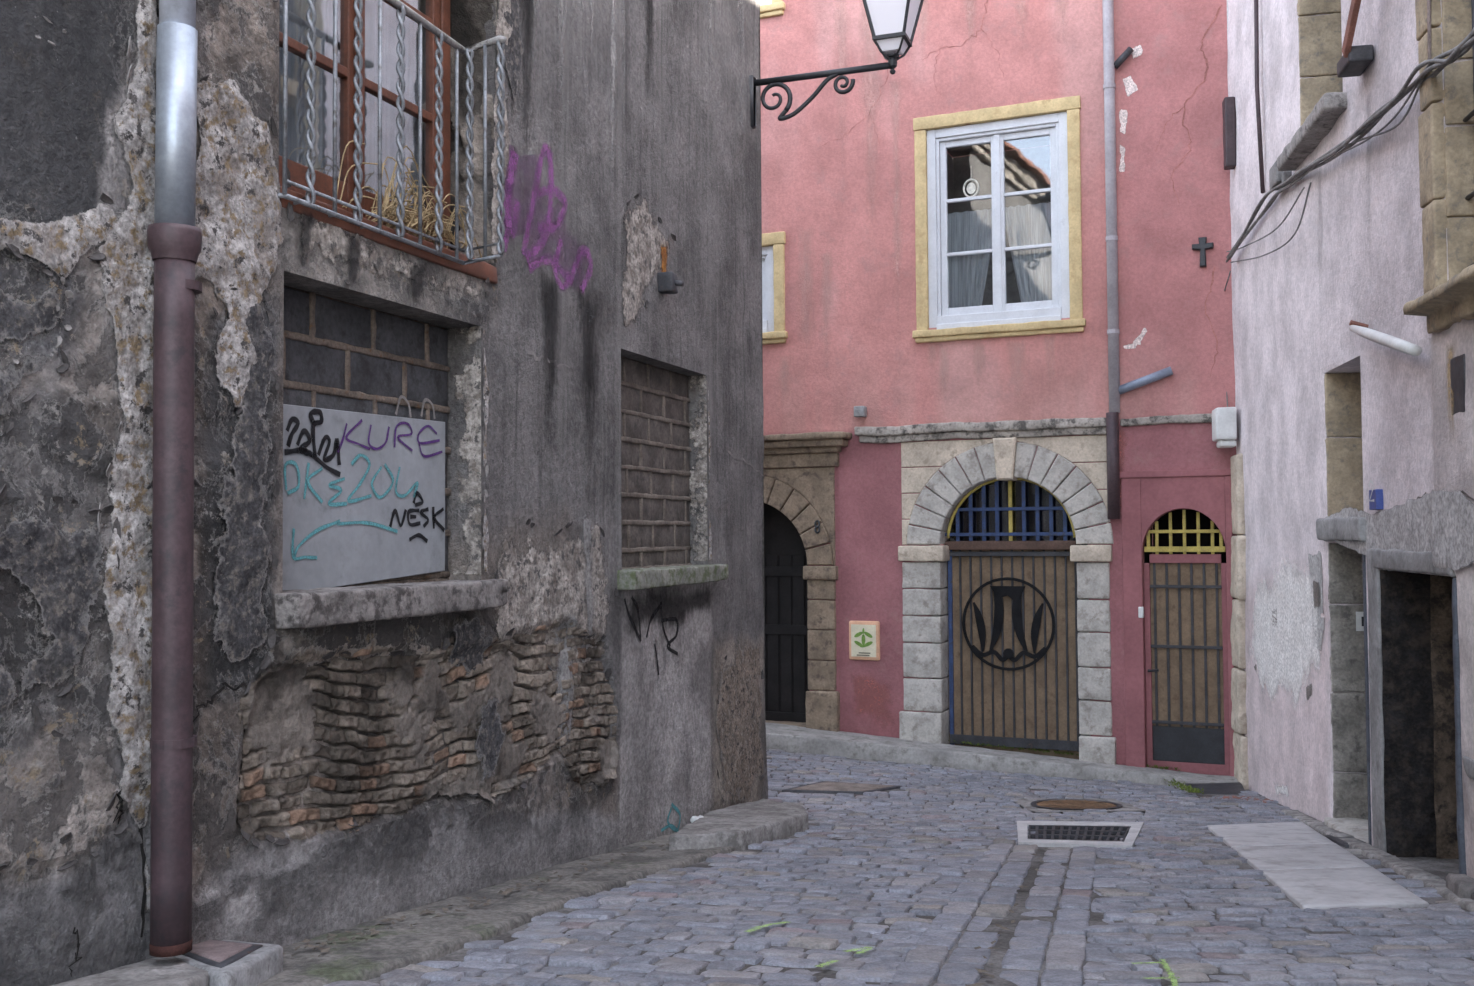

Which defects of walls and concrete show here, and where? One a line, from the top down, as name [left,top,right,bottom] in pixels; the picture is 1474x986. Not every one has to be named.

flaking render [0,0,158,871]
flaking render [195,75,619,848]
peeling [491,0,513,255]
flaking render [622,194,676,327]